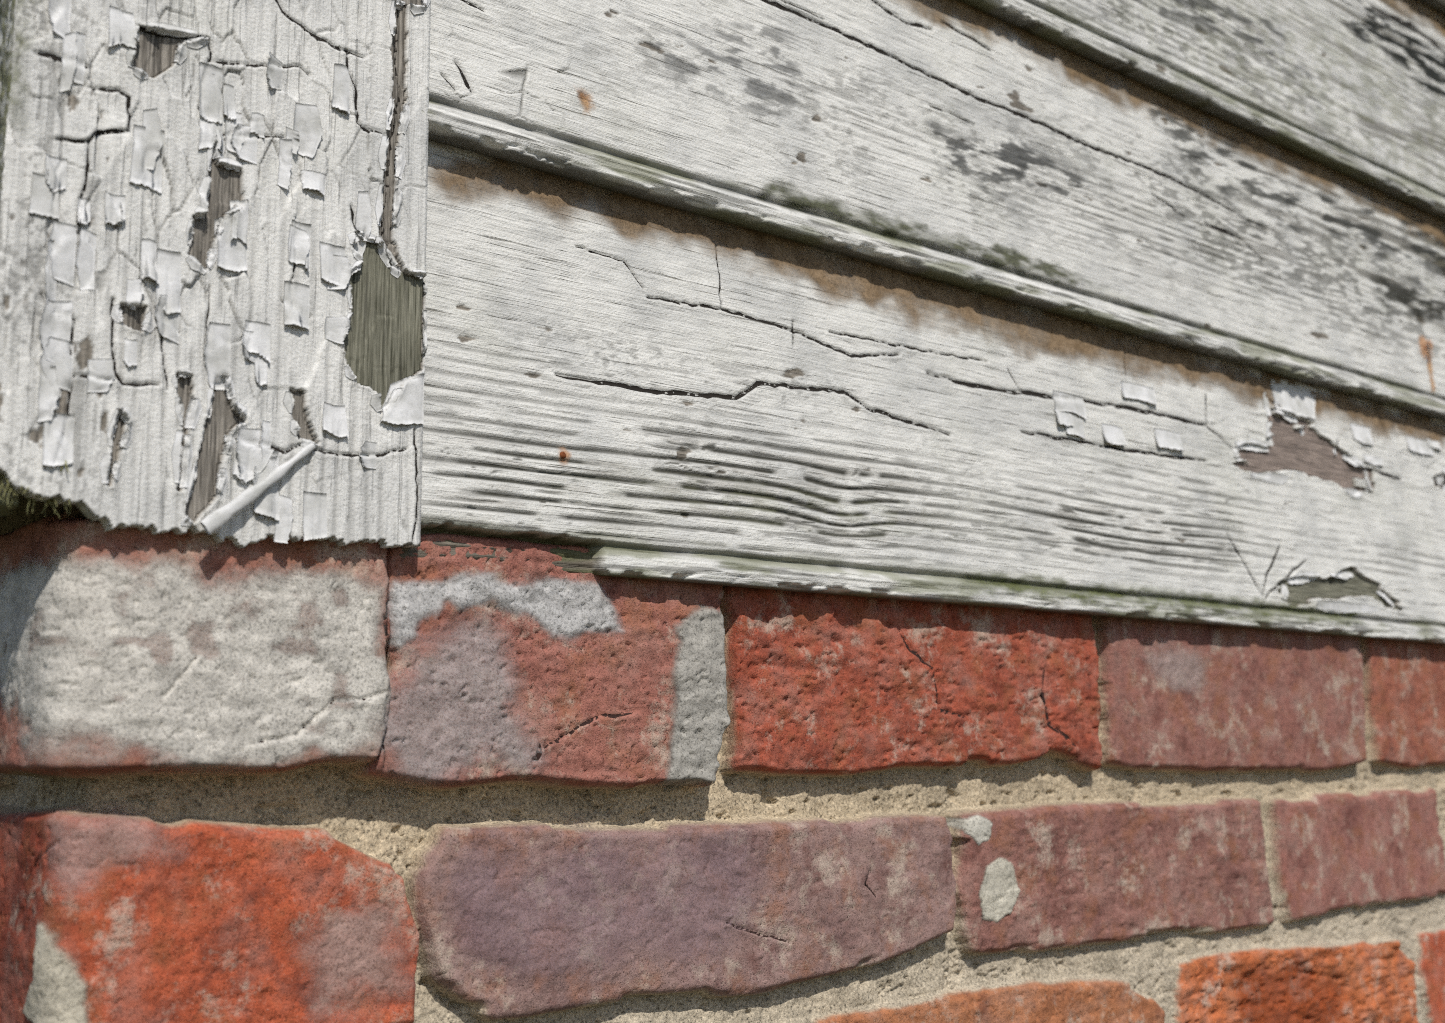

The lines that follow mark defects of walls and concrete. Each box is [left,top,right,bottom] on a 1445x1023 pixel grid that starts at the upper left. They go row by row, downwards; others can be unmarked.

crack [761,0,1264,258]
peeling [29,0,350,467]
peeling [171,0,430,544]
crack [556,247,1229,461]
rust [1419,337,1435,391]
peeling [99,407,133,486]
peeling [1231,379,1384,498]
peeling [1405,435,1445,490]
peeling [1278,567,1400,613]